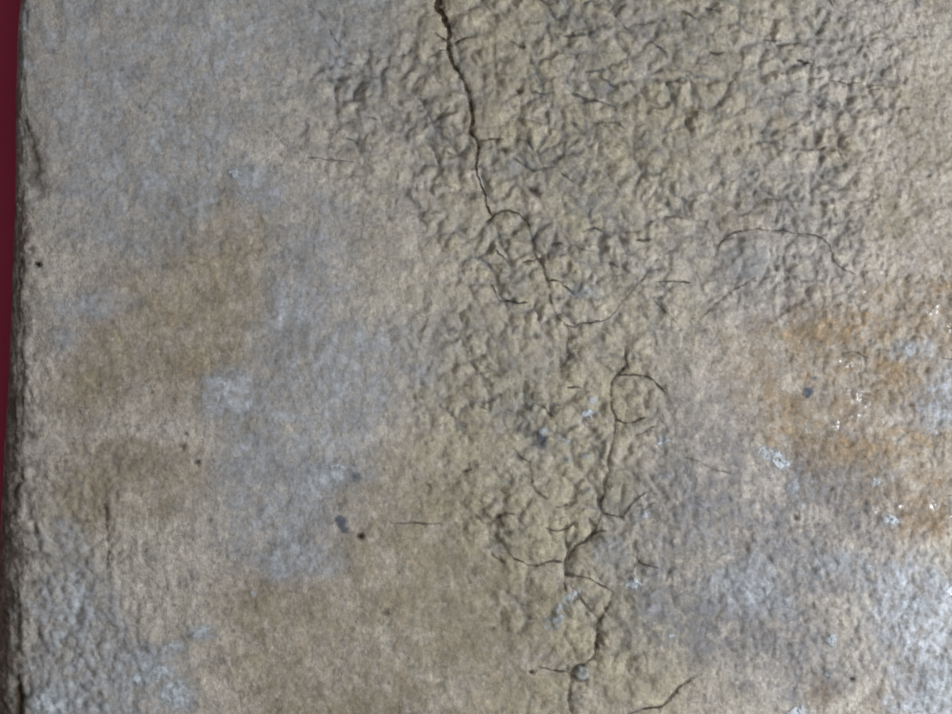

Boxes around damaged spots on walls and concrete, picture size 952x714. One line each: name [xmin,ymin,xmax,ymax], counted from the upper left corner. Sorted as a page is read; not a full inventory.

crack [540,0,668,62]
crack [515,69,624,191]
crack [433,0,605,389]
crack [776,230,854,274]
crack [477,352,665,714]
crack [632,675,698,714]